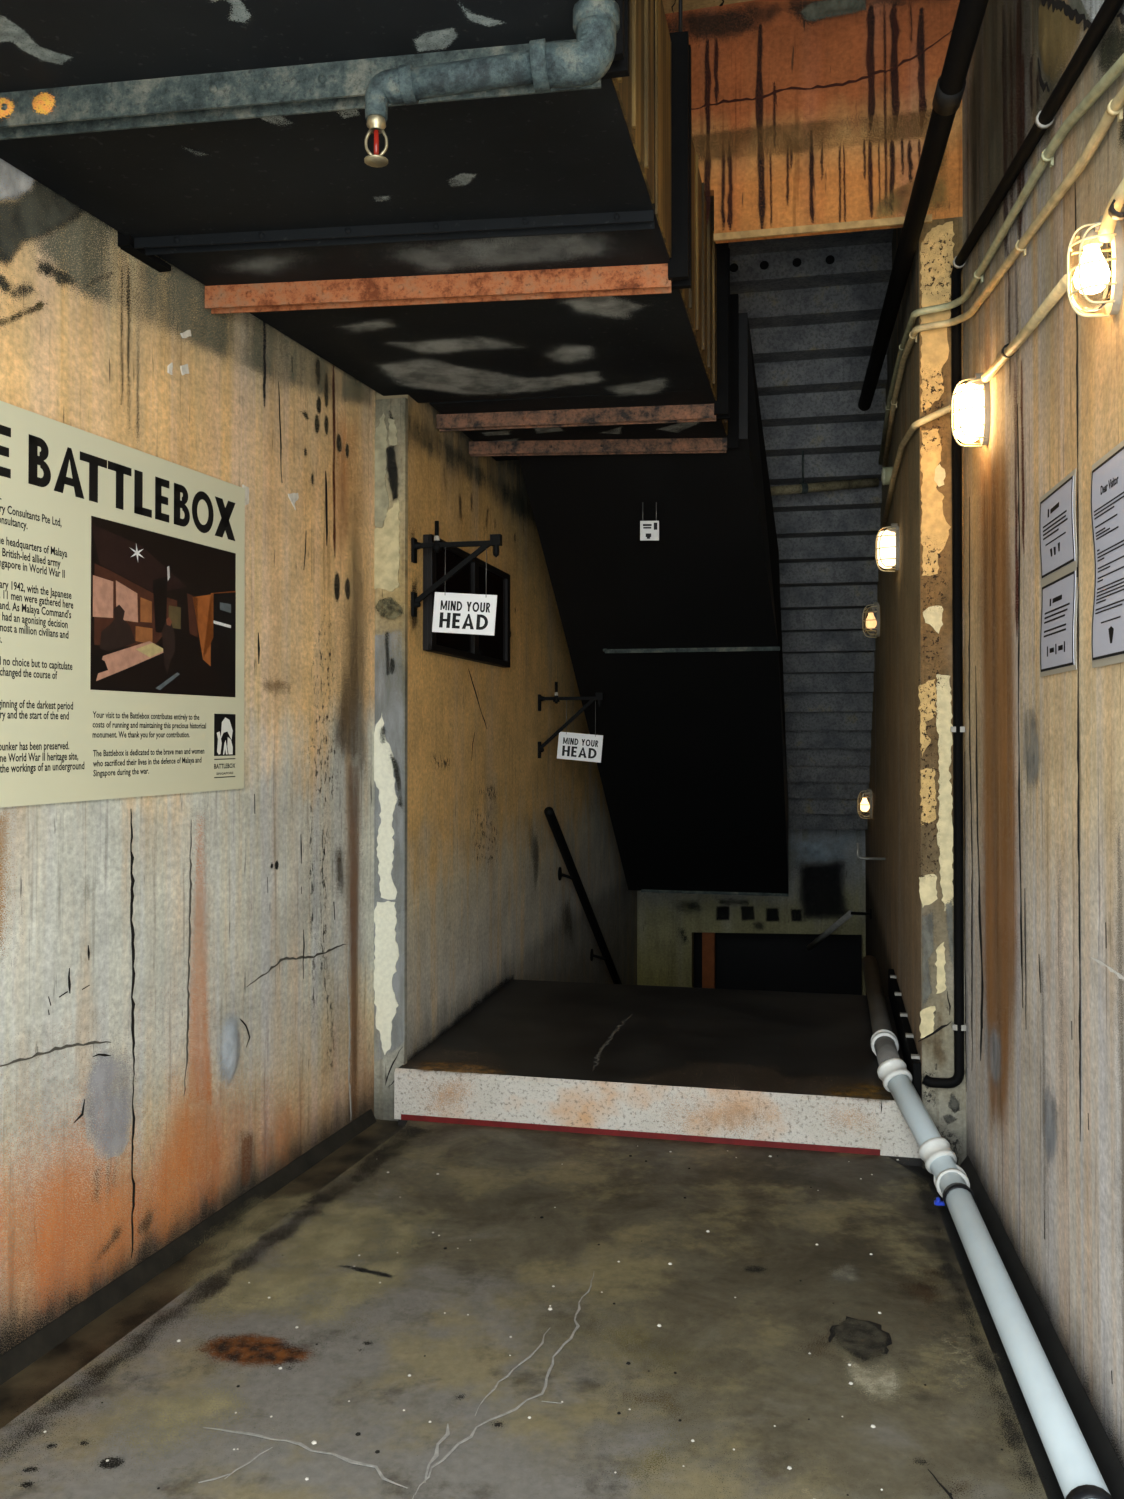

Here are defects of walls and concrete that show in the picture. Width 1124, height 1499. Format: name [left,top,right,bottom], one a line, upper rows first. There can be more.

crack [198,1274,594,1499]